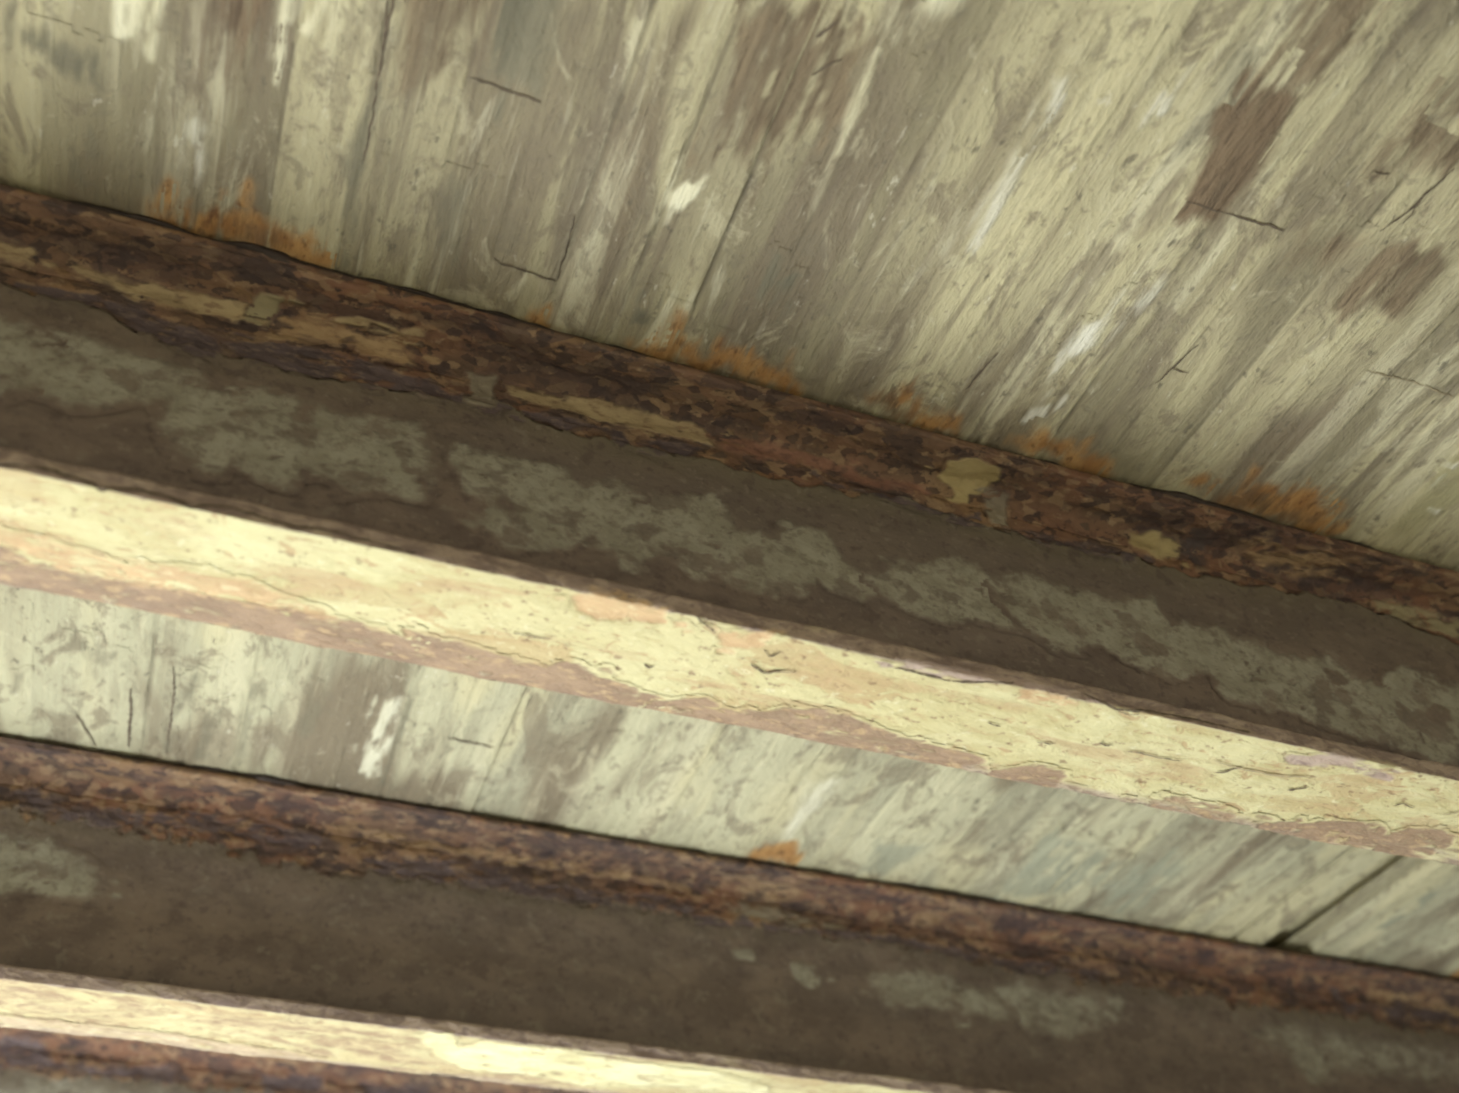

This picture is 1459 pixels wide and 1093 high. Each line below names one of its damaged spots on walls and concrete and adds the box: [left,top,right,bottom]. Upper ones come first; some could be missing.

leakage [0,0,121,207]
leakage [181,0,279,152]
corrosion [131,161,359,273]
leakage [326,0,589,277]
leakage [671,0,888,226]
leakage [1103,0,1412,249]
leakage [1266,45,1459,335]
corrosion [0,231,444,371]
corrosion [462,369,739,452]
corrosion [843,371,1129,529]
corrosion [1170,453,1369,588]
corrosion [327,822,867,930]